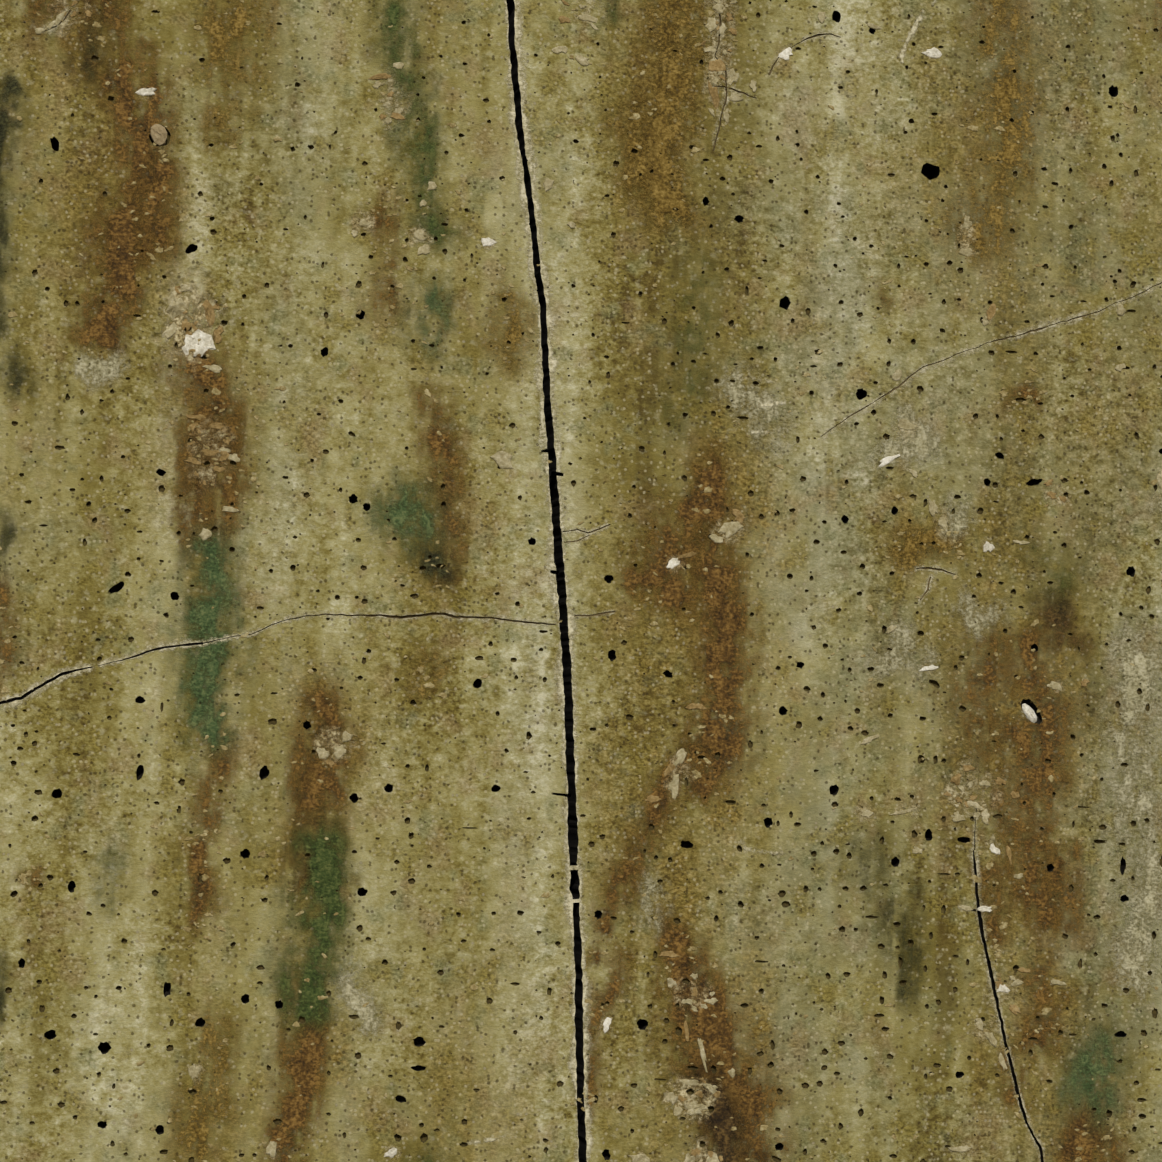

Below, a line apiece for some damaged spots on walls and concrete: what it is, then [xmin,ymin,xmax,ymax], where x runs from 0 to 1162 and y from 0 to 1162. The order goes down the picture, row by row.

corrosion [28,0,179,354]
corrosion [607,0,723,230]
corrosion [158,349,247,552]
crack [0,0,616,1162]
corrosion [283,688,360,894]
corrosion [589,443,754,965]
corrosion [262,1019,330,1162]
corrosion [583,951,633,1115]
corrosion [656,909,788,1162]
crack [971,809,1044,1162]